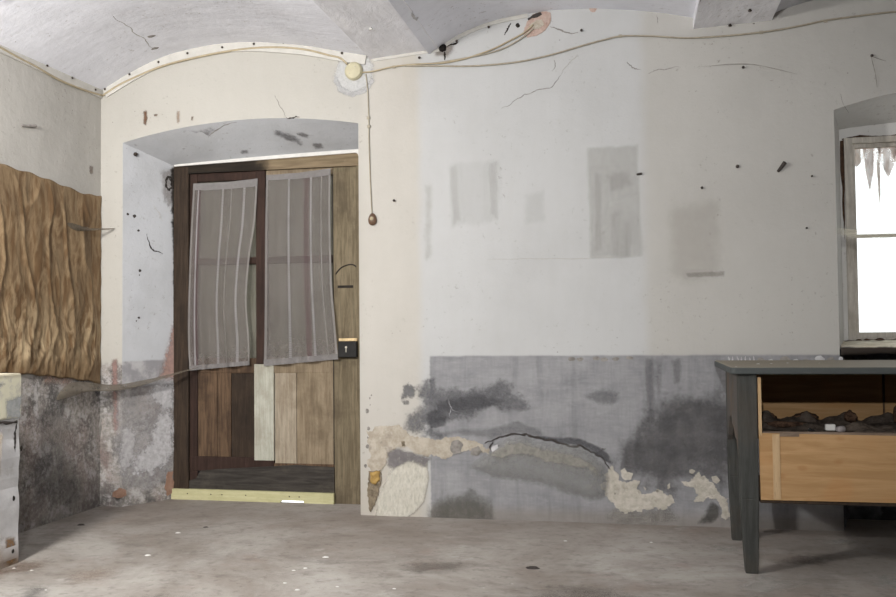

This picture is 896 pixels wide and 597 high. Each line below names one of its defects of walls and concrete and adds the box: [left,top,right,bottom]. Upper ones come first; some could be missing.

crack [505,56,577,107]
damp [120,384,174,476]
spalling [364,425,490,512]
damp [402,380,526,438]
crack [485,433,610,469]
peeling [601,466,675,522]
damp [623,400,727,491]
peeling [682,469,730,523]